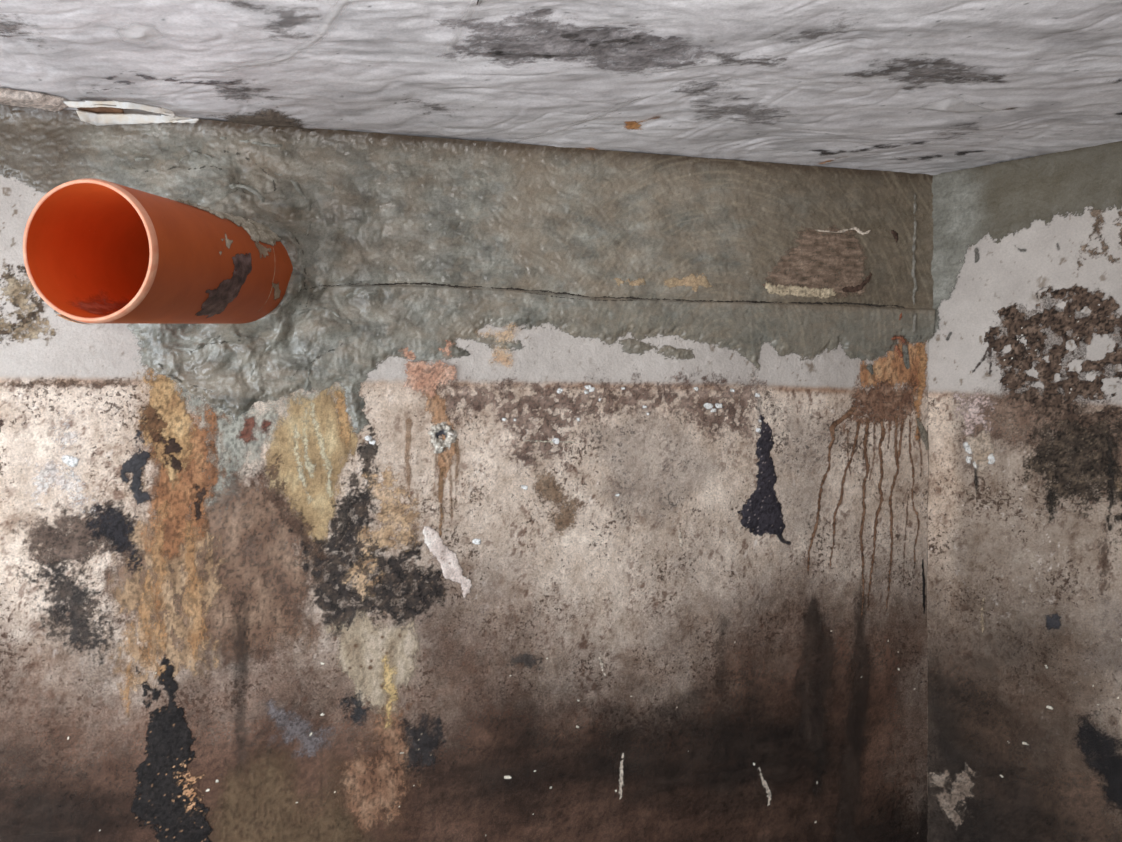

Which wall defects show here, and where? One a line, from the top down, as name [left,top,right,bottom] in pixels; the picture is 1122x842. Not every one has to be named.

crack [129,150,276,193]
crack [294,237,904,312]
peeling [1077,209,1122,267]
leakage [0,378,131,389]
spalling [972,284,1122,433]
rust [104,368,330,710]
rust [807,336,928,616]
leakage [0,386,1122,842]